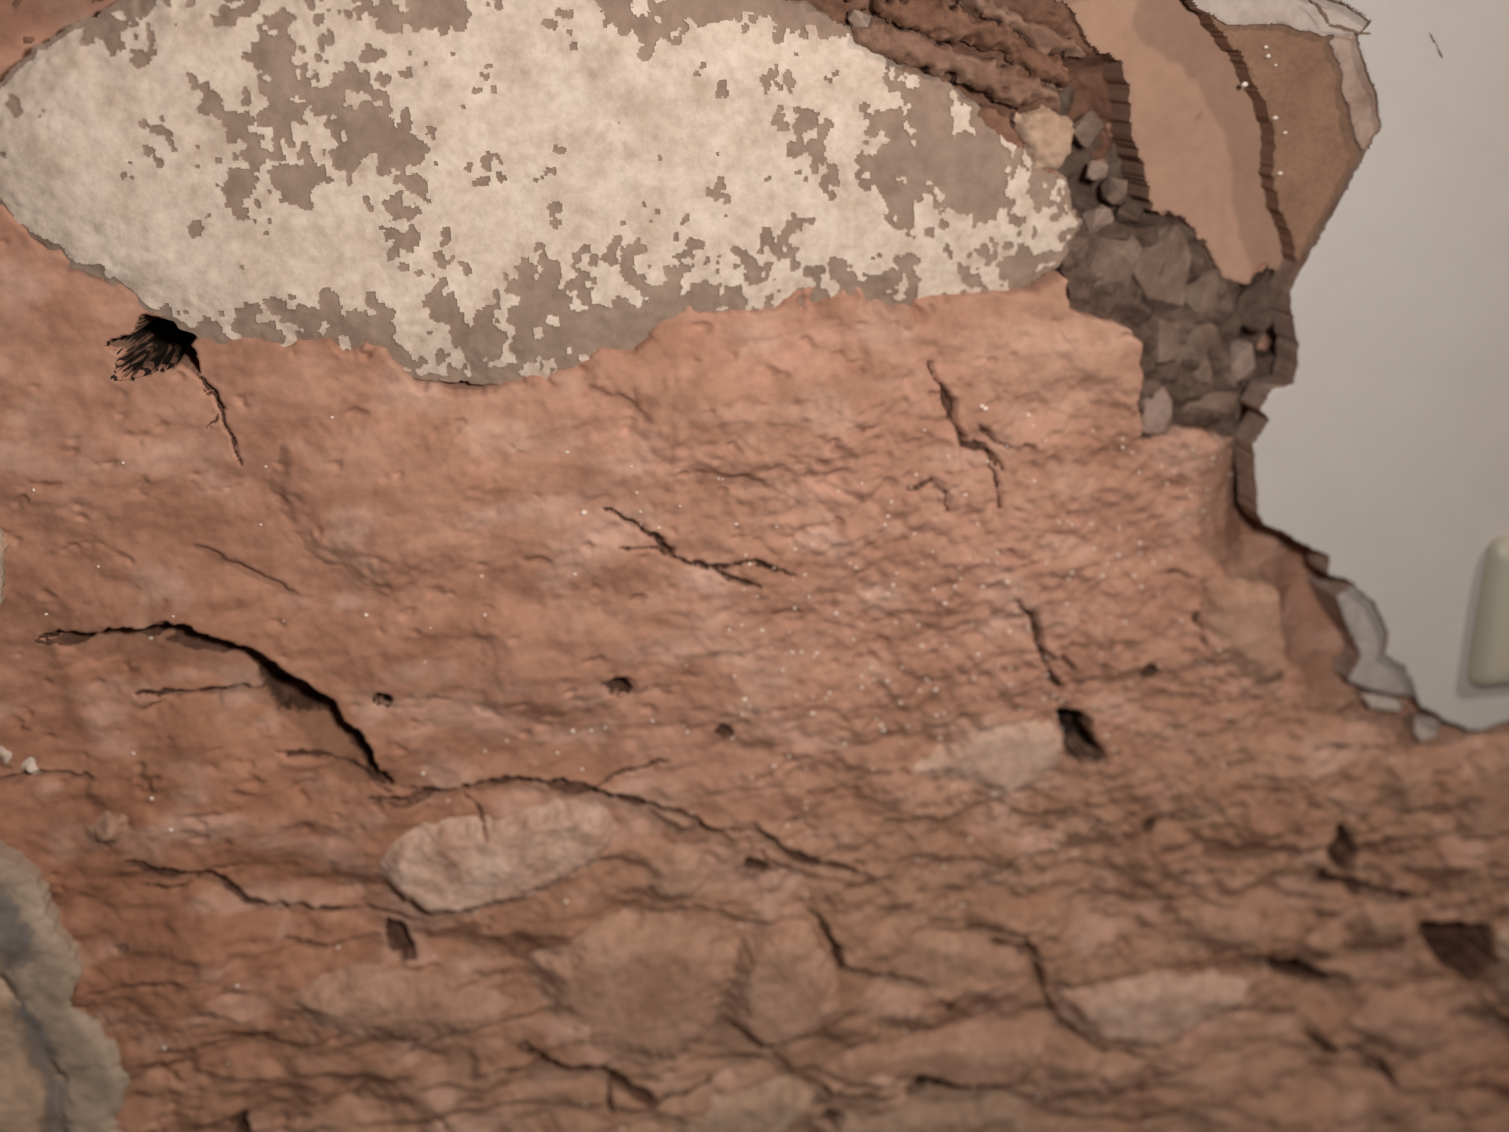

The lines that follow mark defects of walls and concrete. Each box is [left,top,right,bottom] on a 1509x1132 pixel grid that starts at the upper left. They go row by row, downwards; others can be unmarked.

crack [193,372,242,465]
peeling [0,0,1509,743]
crack [907,479,949,511]
crack [927,361,1012,509]
crack [35,629,97,646]
crack [134,621,699,830]
crack [752,822,857,872]
flaking render [0,840,131,1132]